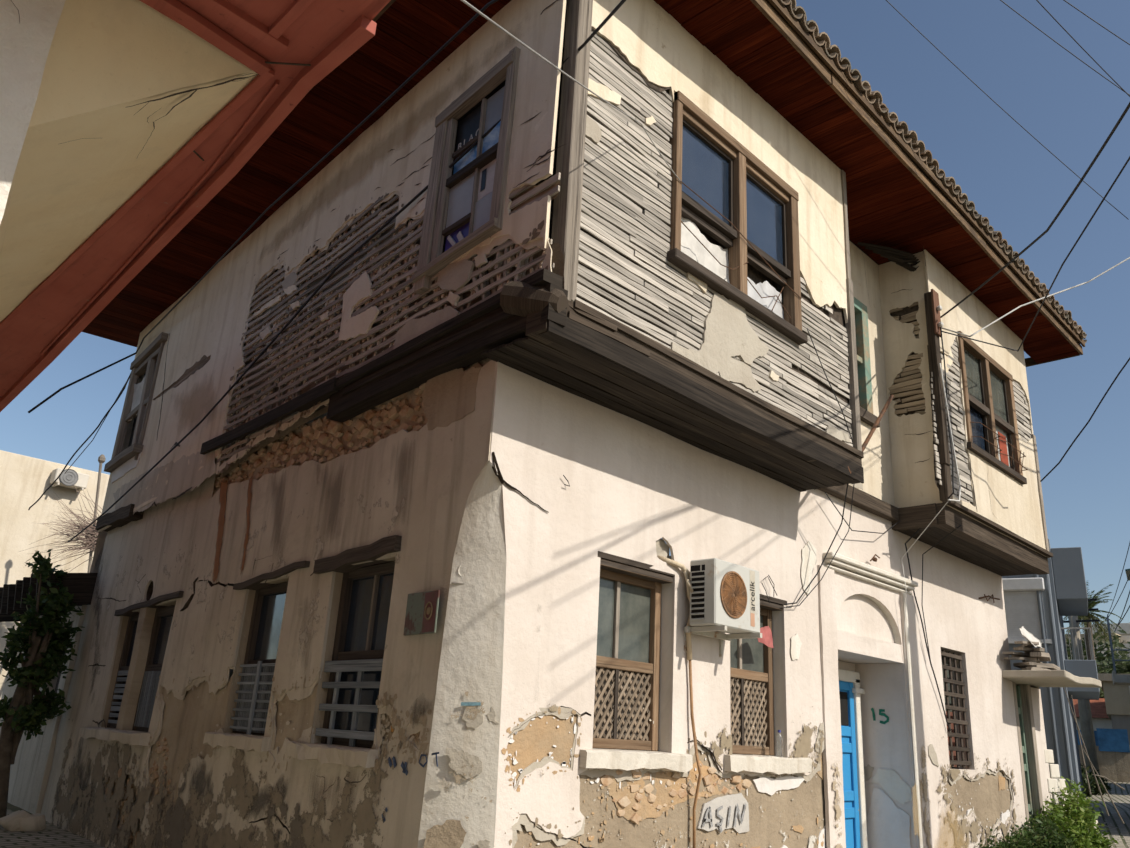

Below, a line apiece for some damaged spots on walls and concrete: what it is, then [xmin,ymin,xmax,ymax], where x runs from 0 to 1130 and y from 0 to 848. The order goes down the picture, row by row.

crack [125,73,259,159]
flaking render [588,78,621,105]
spalling [591,27,671,92]
flaking render [111,191,565,514]
corrosion [213,481,228,582]
corrosion [241,476,253,572]
crack [492,452,549,513]
flaking render [825,426,850,443]
flaking render [888,338,973,504]
crack [180,555,274,611]
flaking render [451,690,843,848]
flaking render [858,744,1021,848]